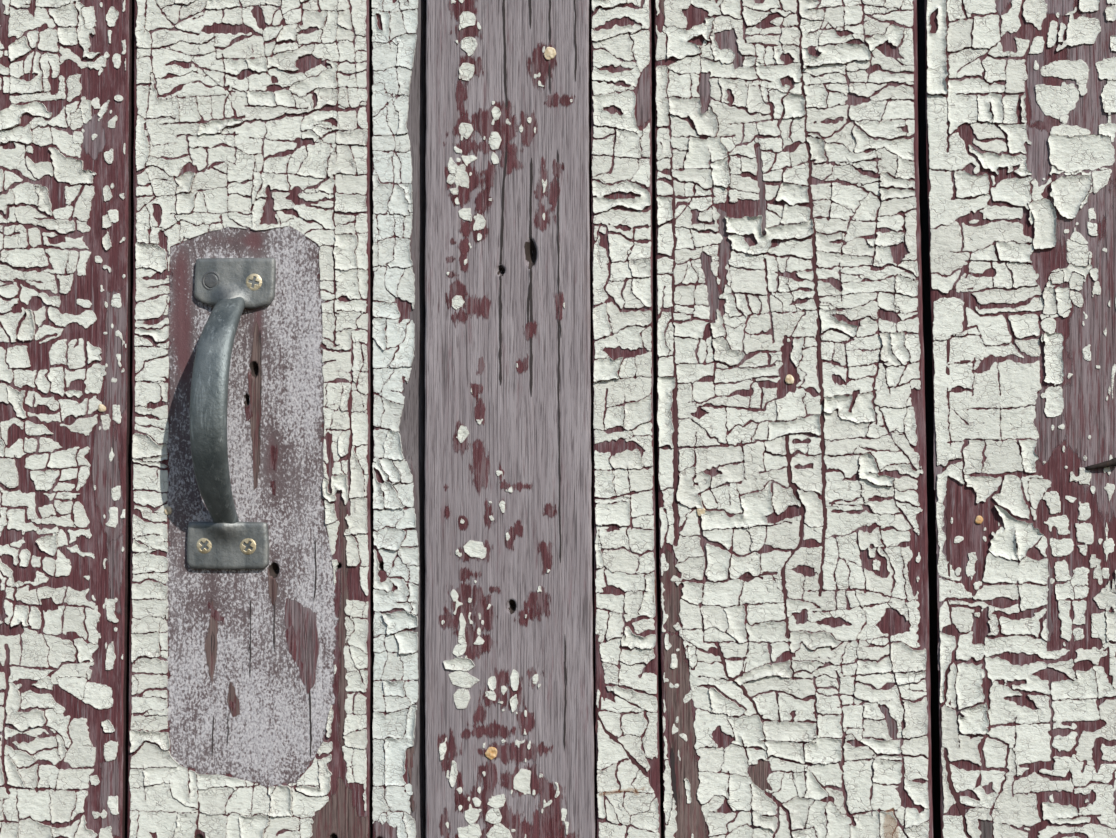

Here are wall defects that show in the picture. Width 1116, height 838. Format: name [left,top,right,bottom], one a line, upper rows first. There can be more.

peeling [0,0,419,838]
peeling [437,357,578,838]
peeling [443,0,576,327]
peeling [516,354,528,373]
peeling [523,321,537,340]
crack [595,698,677,805]
crack [670,153,711,544]
crack [718,646,812,723]
crack [736,0,877,638]
peeling [592,0,1116,838]
crack [946,338,971,635]
crack [945,751,995,838]